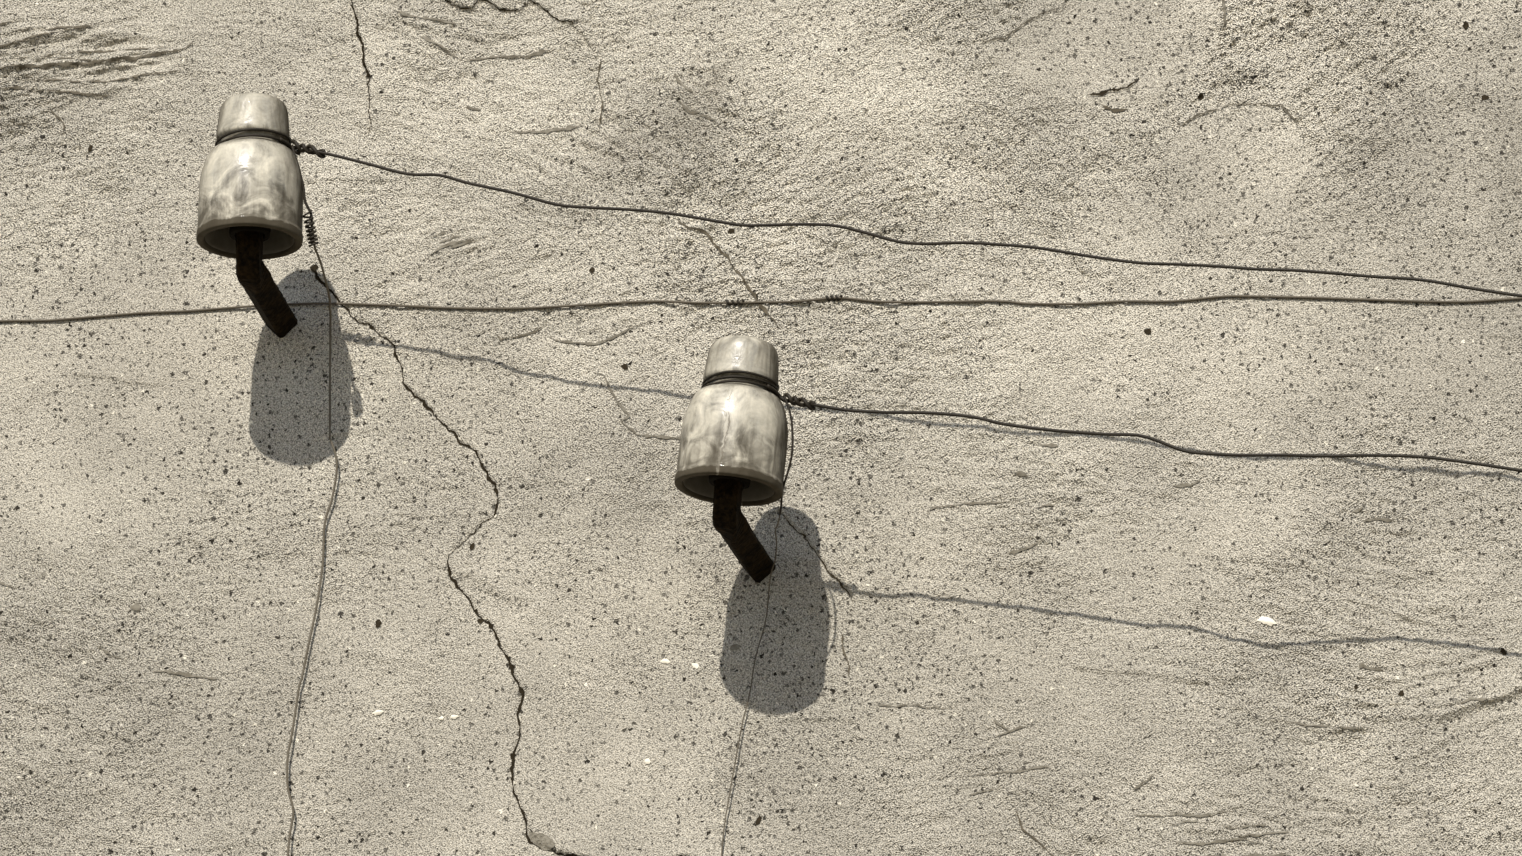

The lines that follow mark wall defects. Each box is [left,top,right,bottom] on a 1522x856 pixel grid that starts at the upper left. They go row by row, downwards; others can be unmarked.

crack [351,0,371,133]
crack [445,0,604,130]
crack [676,218,783,331]
crack [495,321,680,439]
crack [310,264,577,856]